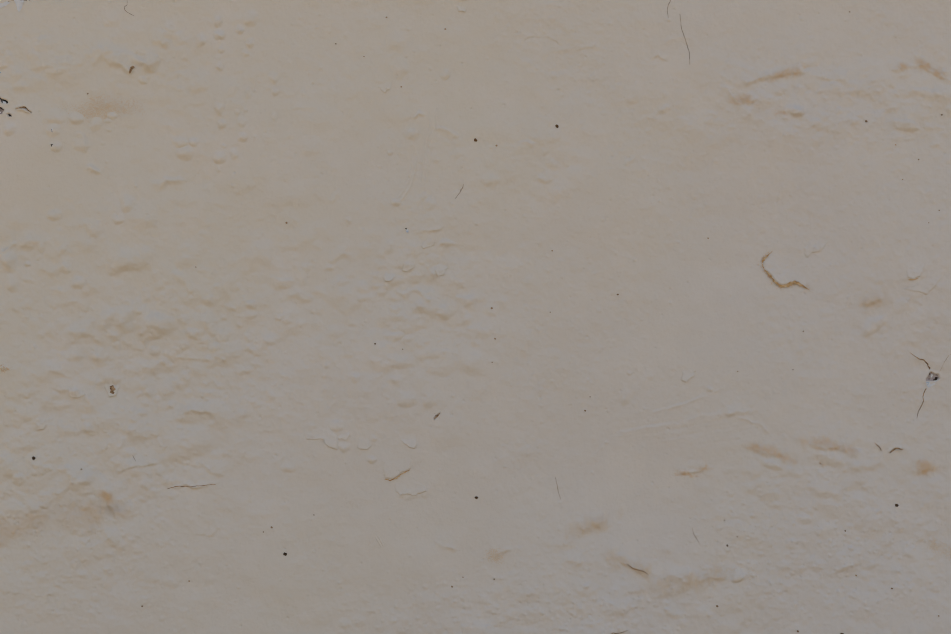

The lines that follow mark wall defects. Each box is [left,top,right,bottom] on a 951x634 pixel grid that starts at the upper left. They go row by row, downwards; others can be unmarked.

crack [911,353,949,417]